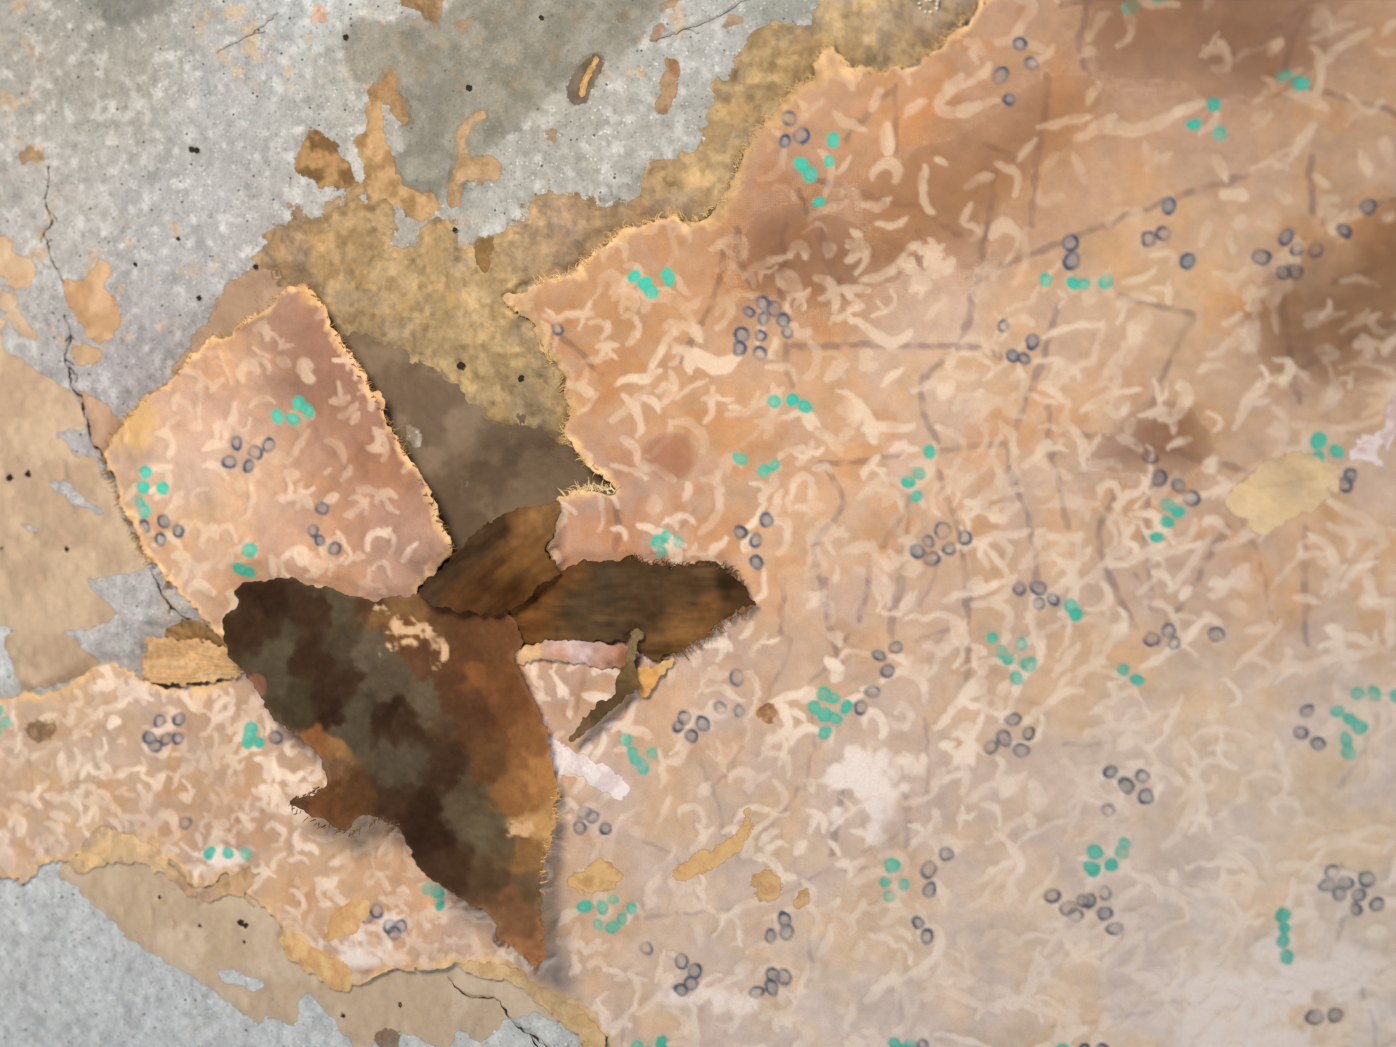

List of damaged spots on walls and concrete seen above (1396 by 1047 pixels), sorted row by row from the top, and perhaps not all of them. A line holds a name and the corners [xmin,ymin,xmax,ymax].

spalling [566,52,604,105]
crack [41,166,115,478]
crack [149,568,193,621]
crack [448,978,547,1047]